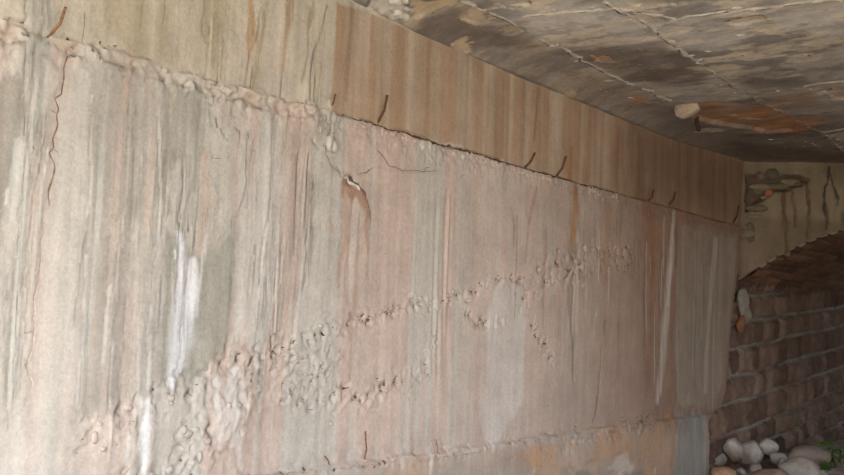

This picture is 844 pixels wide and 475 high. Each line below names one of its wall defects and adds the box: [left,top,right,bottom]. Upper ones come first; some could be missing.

leakage [0,0,66,429]
crack [23,12,85,408]
leakage [68,0,371,475]
crack [325,129,431,177]
peeling [448,35,475,54]
corrosion [331,0,620,258]
leakage [449,164,557,452]
flaking render [674,103,726,134]
leakage [556,117,844,475]
corrosion [613,91,838,136]